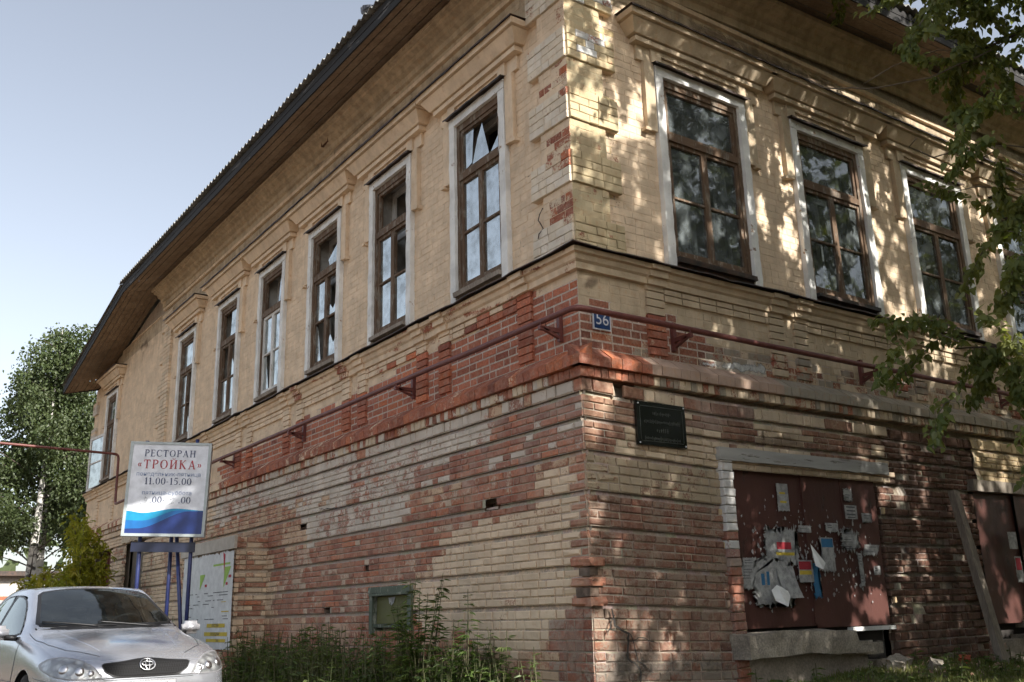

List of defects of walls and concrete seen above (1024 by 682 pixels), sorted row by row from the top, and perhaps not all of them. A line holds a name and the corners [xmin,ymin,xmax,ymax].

peeling [575,29,605,59]
peeling [539,63,568,98]
peeling [545,125,574,174]
peeling [549,190,574,226]
peeling [661,314,714,362]
peeling [217,280,650,479]
peeling [270,377,644,624]